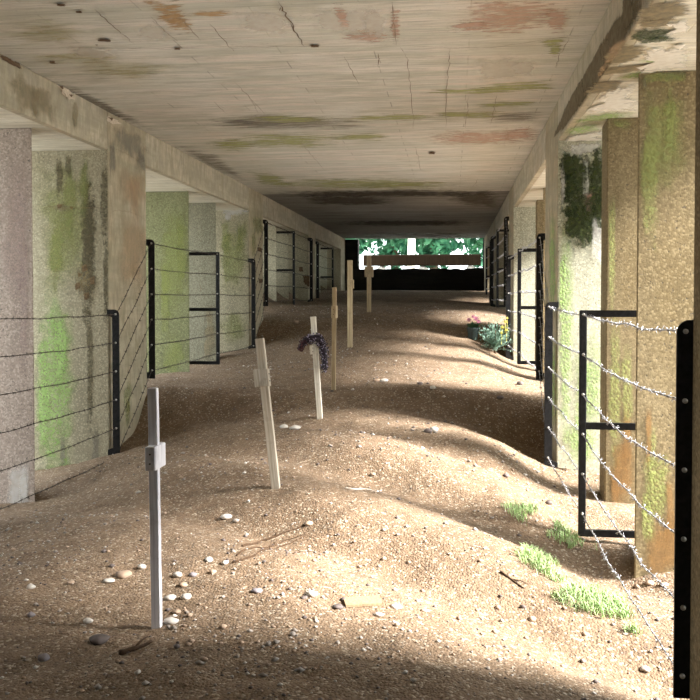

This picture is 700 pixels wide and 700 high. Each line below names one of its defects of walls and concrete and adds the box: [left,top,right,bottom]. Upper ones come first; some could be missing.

rust [148,2,191,30]
crack [273,3,358,82]
crack [390,5,426,123]
rust [454,2,569,33]
damp [554,0,689,137]
damp [228,116,384,140]
damp [301,182,494,206]
damp [559,144,614,275]
damp [52,149,114,423]
rust [612,417,631,503]